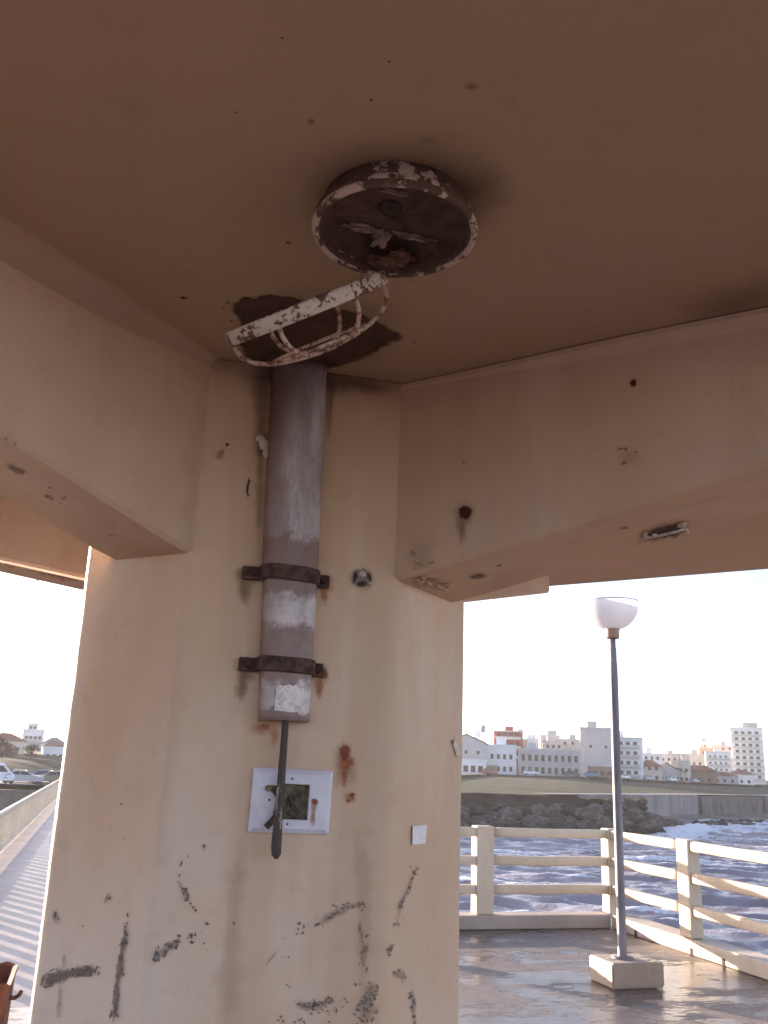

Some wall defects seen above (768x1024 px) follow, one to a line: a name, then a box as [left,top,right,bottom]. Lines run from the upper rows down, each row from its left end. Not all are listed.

spalling [640,522,689,540]
rust [340,746,354,802]